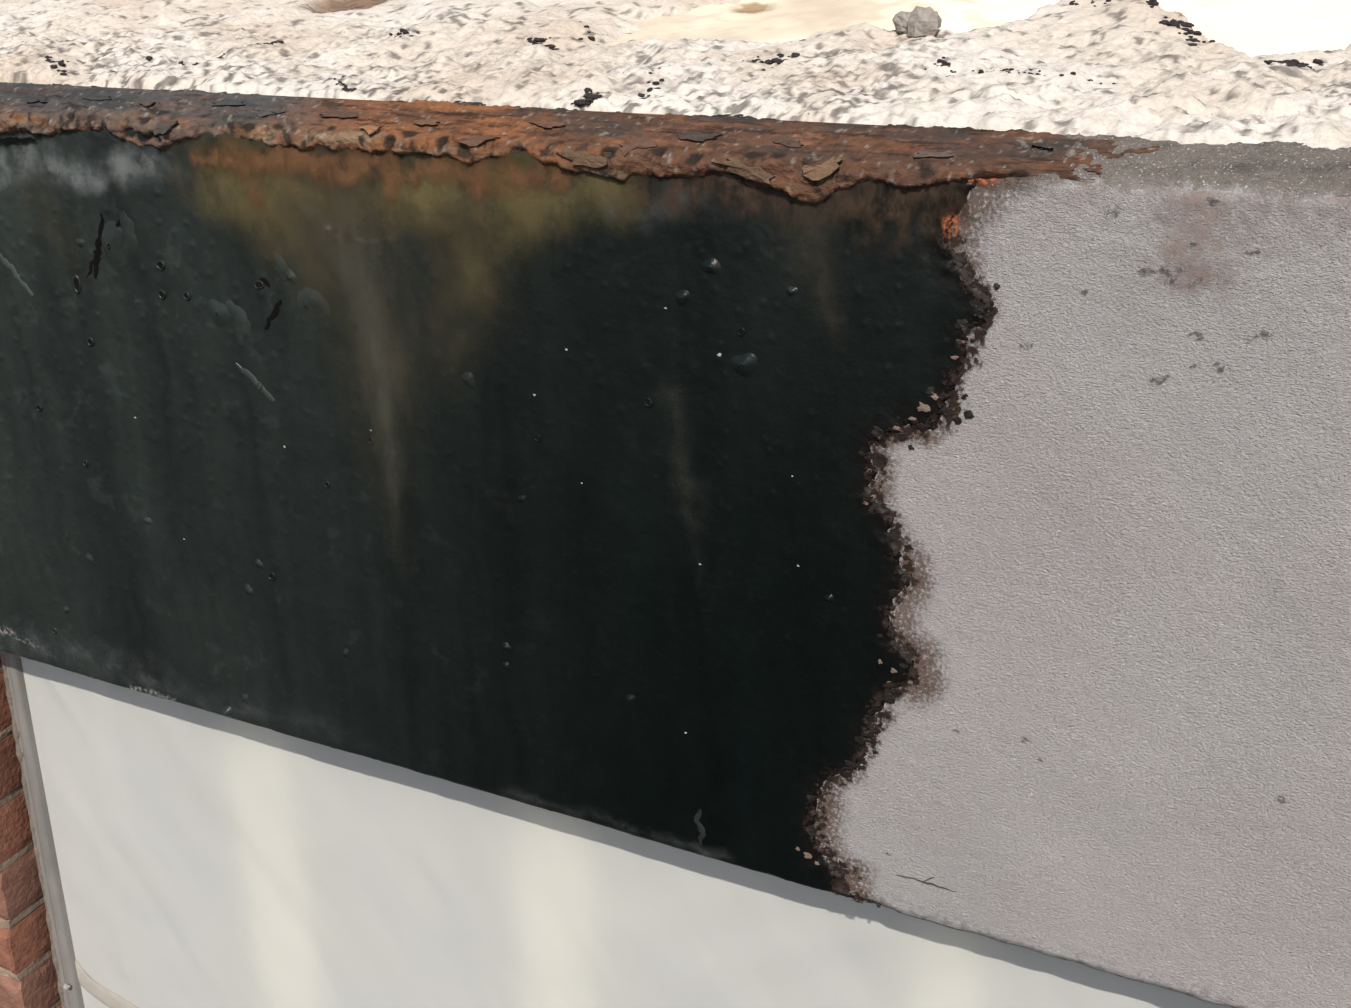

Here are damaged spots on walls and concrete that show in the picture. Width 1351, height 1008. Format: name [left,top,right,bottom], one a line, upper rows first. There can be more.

leakage [205,171,620,396]
rust [0,82,1160,284]
peeling [795,233,1000,913]